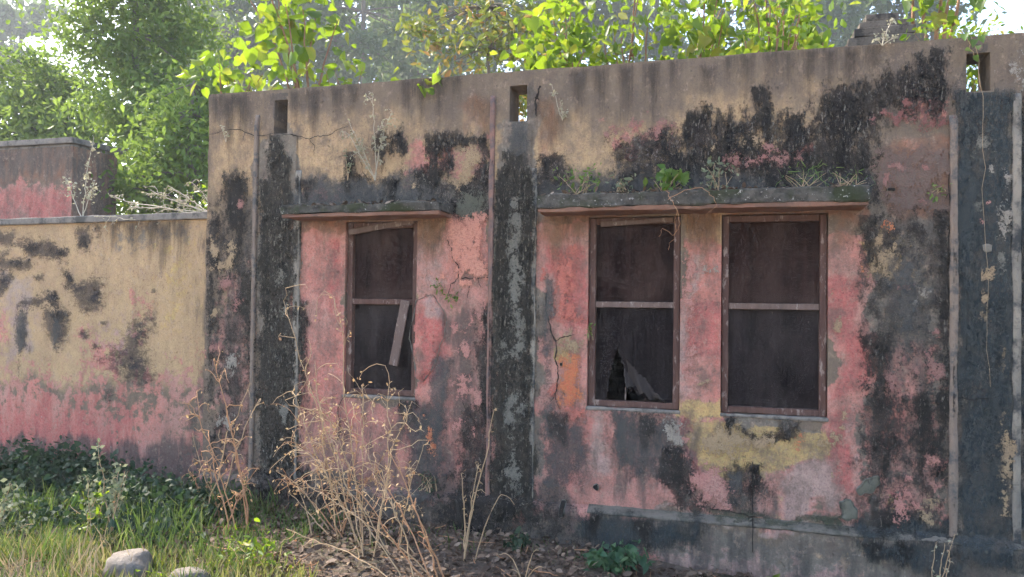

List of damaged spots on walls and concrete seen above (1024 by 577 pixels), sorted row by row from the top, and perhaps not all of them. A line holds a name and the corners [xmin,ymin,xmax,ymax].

crack [215,126,348,149]
damp [0,222,183,362]
damp [80,314,155,387]
crack [545,293,574,407]
damp [204,46,1024,577]
peeling [662,413,775,515]